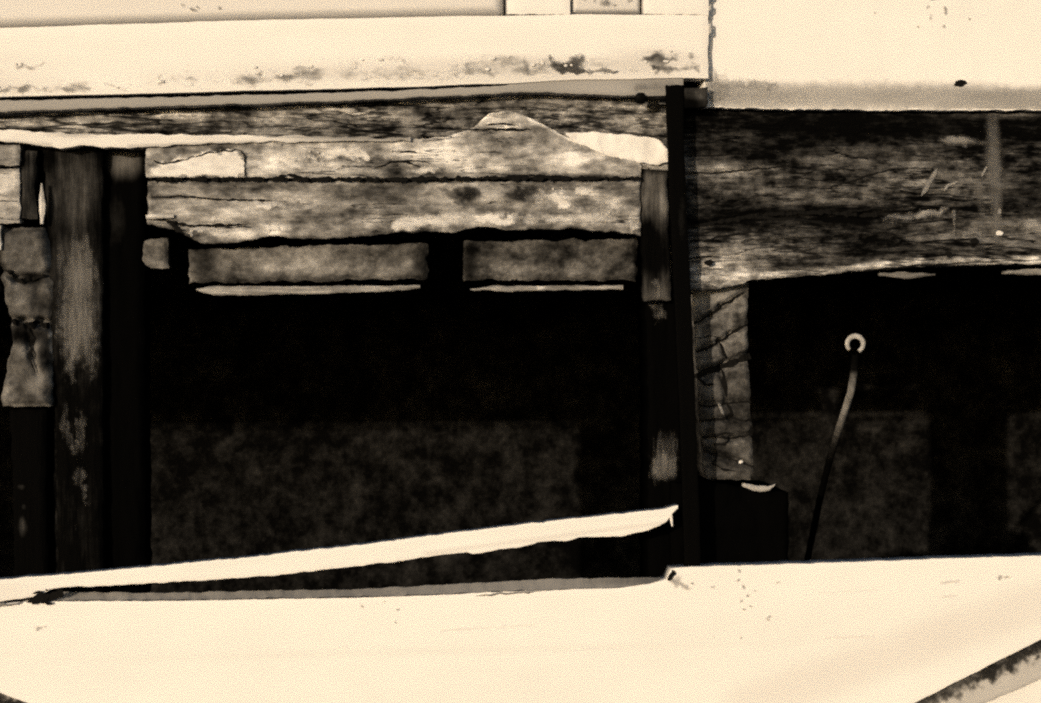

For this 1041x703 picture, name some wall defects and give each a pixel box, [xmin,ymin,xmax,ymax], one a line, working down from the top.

peeling [644,49,674,71]